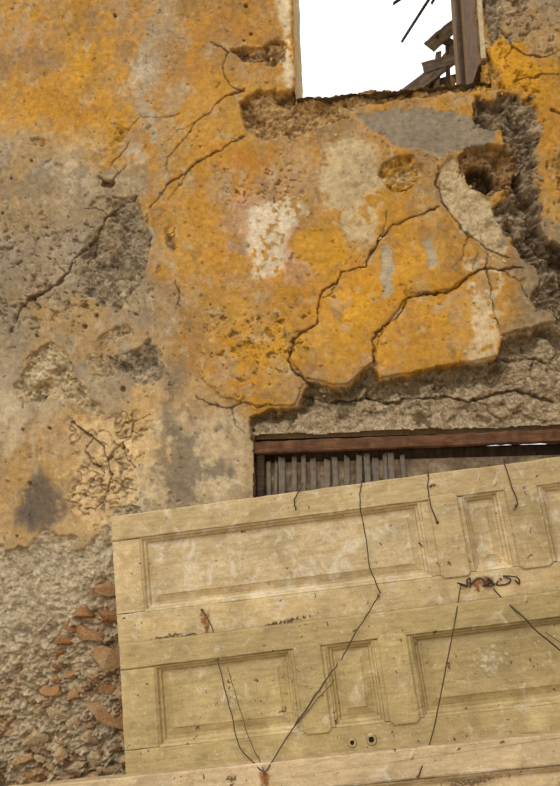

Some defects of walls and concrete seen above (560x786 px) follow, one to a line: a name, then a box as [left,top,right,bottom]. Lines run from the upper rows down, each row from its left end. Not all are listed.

crack [17,204,126,322]
crack [175,279,186,311]
crack [111,41,269,210]
spalling [231,0,560,441]
crack [288,165,560,407]
spalling [0,322,169,786]